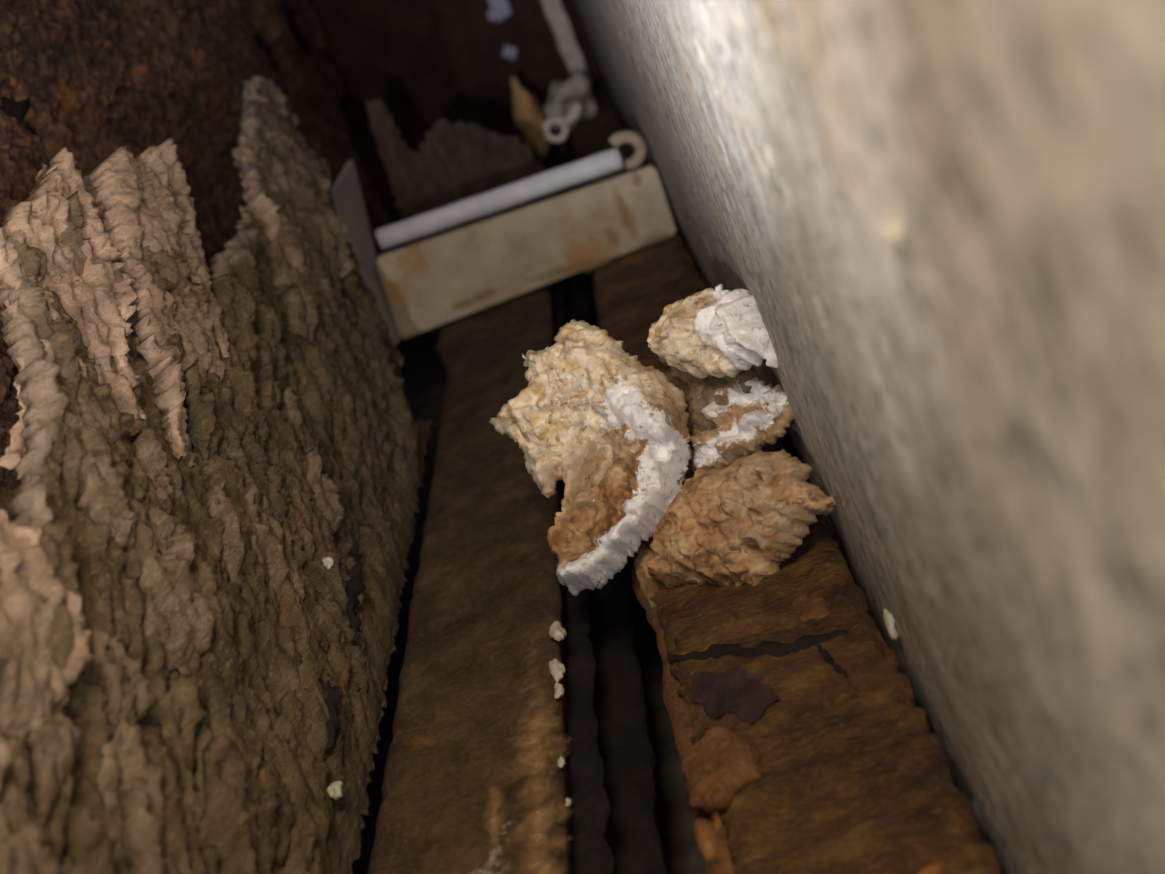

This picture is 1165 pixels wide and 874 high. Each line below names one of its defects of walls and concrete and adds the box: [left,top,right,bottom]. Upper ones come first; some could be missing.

peeling [487,0,512,23]
peeling [502,44,517,60]
spalling [0,96,42,141]
rust [0,75,434,874]
crack [667,630,850,679]